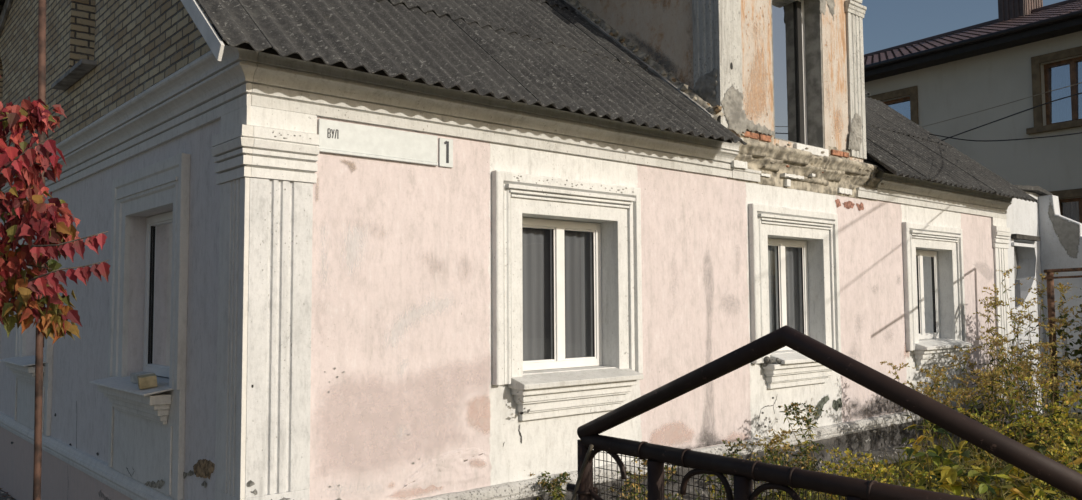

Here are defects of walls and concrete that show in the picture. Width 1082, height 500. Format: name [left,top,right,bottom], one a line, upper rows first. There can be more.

spalling [727,6,884,211]
peeling [812,394,842,421]
leakage [853,399,905,416]
spalling [183,457,215,488]